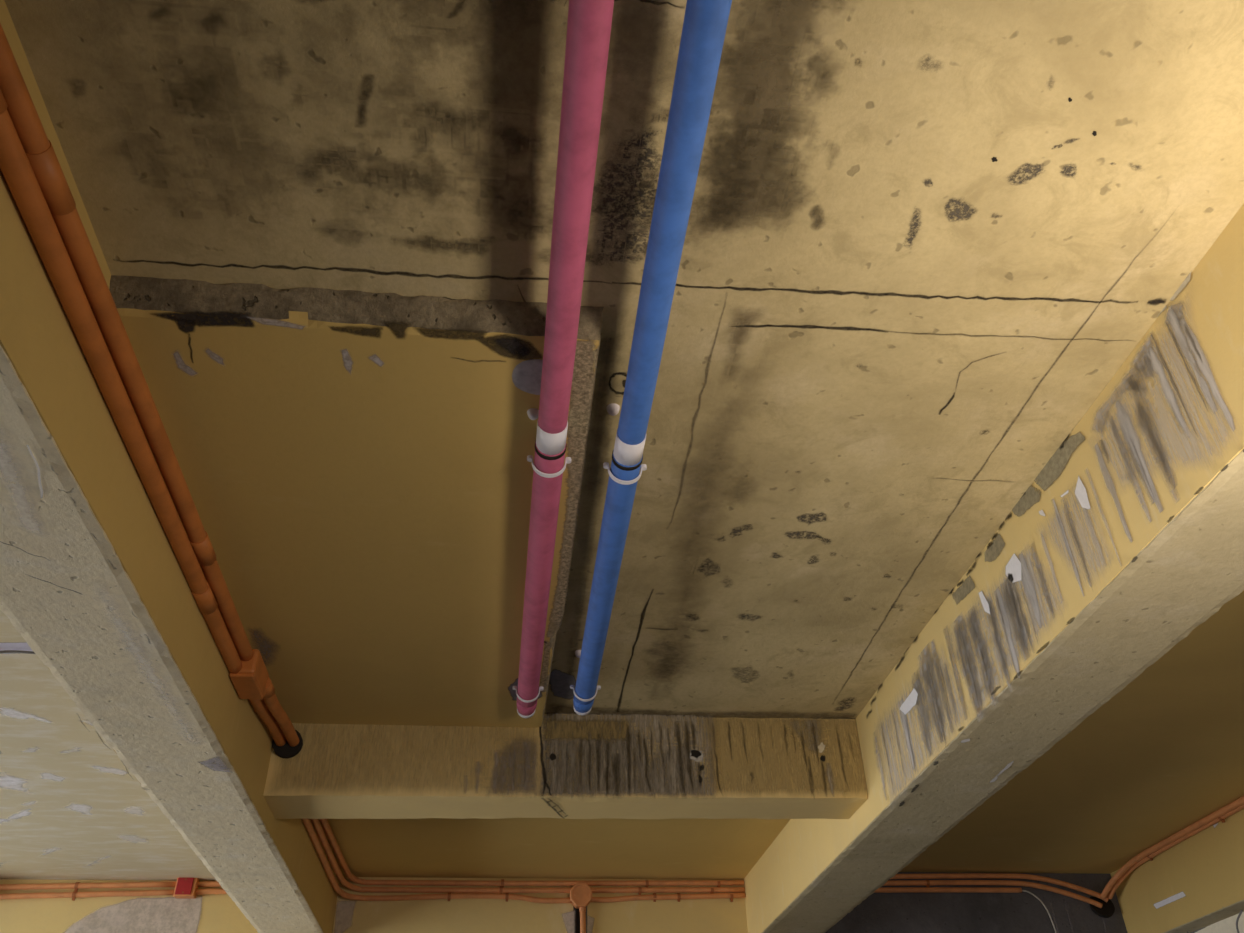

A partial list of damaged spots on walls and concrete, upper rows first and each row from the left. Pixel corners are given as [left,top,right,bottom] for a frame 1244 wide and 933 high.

crack [614,0,679,8]
damp [703,0,822,227]
spalling [154,312,254,362]
crack [123,260,549,301]
spalling [330,322,543,362]
damp [410,237,488,253]
damp [586,115,668,264]
damp [284,304,1235,796]
crack [673,264,1165,685]
peeling [949,432,1090,614]
crack [618,591,671,709]
flaking render [1195,912,1244,933]